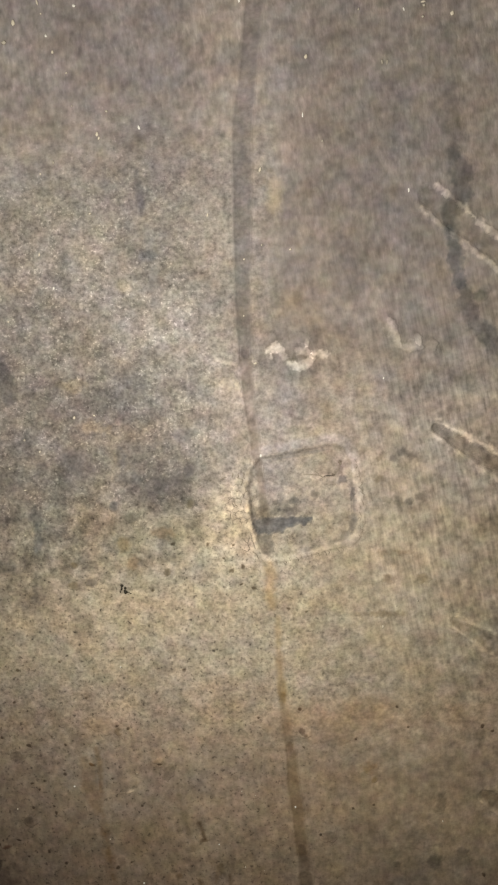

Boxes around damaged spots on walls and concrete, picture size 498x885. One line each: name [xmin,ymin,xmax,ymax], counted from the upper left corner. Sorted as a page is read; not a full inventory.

damp [435,16,477,208]
damp [441,225,498,371]
damp [248,496,313,557]
damp [310,463,356,501]